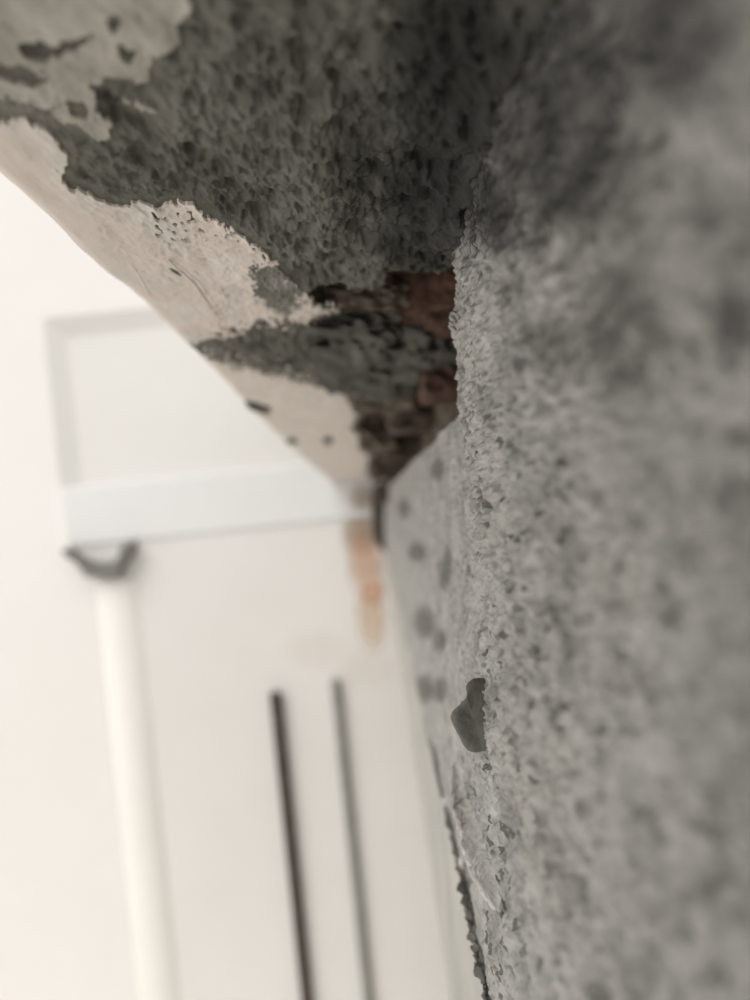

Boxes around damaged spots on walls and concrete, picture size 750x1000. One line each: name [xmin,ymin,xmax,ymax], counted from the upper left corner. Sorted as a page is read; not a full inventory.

peeling [0,0,460,503]
rust [349,519,381,637]